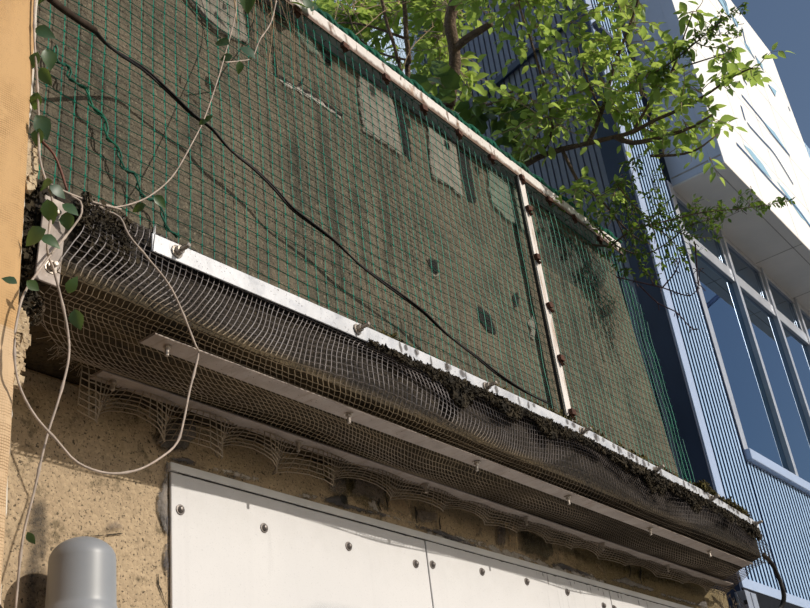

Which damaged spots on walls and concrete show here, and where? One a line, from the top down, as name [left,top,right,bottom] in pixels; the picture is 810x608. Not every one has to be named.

flaking render [358,76,412,162]
flaking render [428,126,476,203]
flaking render [488,169,528,229]
spalling [497,524,553,560]